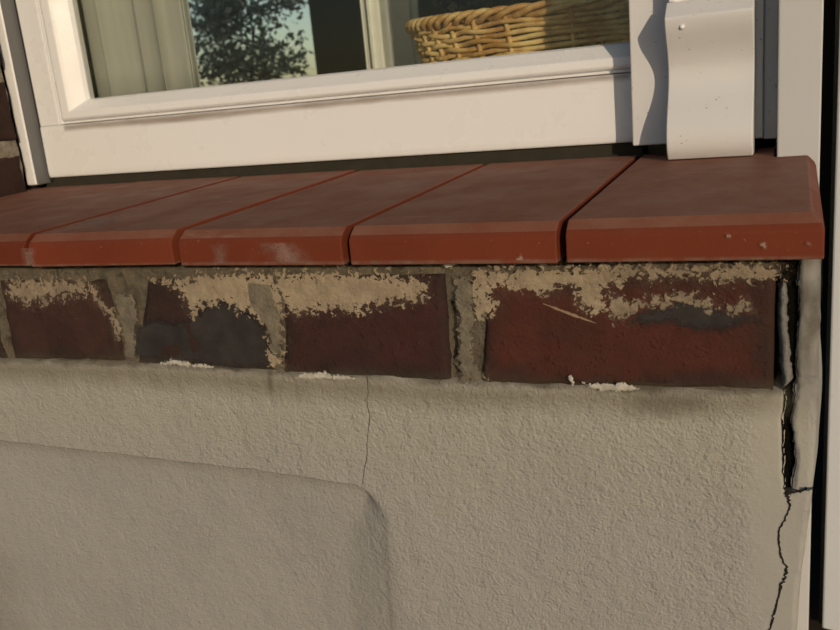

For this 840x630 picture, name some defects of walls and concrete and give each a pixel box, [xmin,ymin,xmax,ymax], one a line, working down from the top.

peeling [4,269,139,359]
water stain [135,300,272,368]
peeling [148,263,431,372]
peeling [296,371,356,380]
crack [362,376,370,485]
peeling [568,375,639,392]
peeling [441,256,793,387]
crack [769,261,816,630]